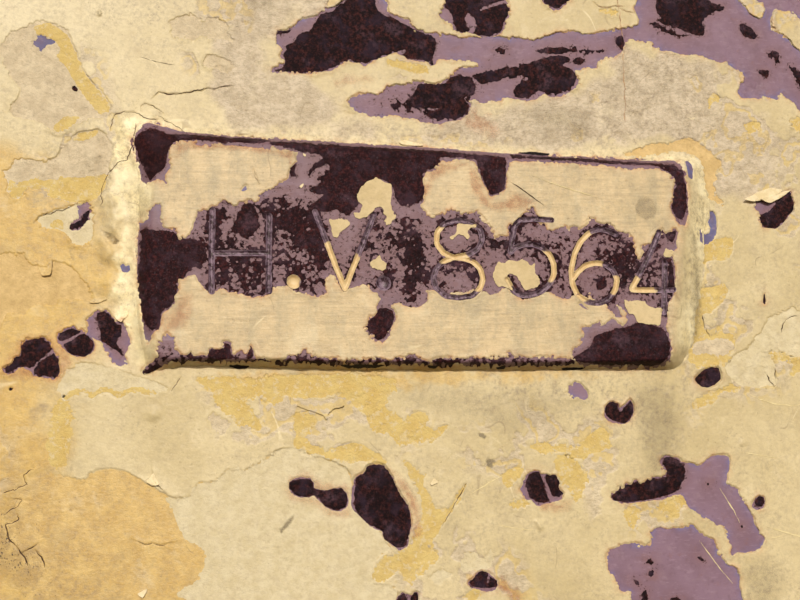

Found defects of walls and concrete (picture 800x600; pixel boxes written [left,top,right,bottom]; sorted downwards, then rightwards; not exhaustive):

peeling [272,0,800,131]
peeling [0,20,112,246]
corrosion [745,188,794,229]
peeling [7,122,743,600]
corrosion [604,400,634,424]
corrosion [289,464,411,550]
corrosion [520,470,563,506]